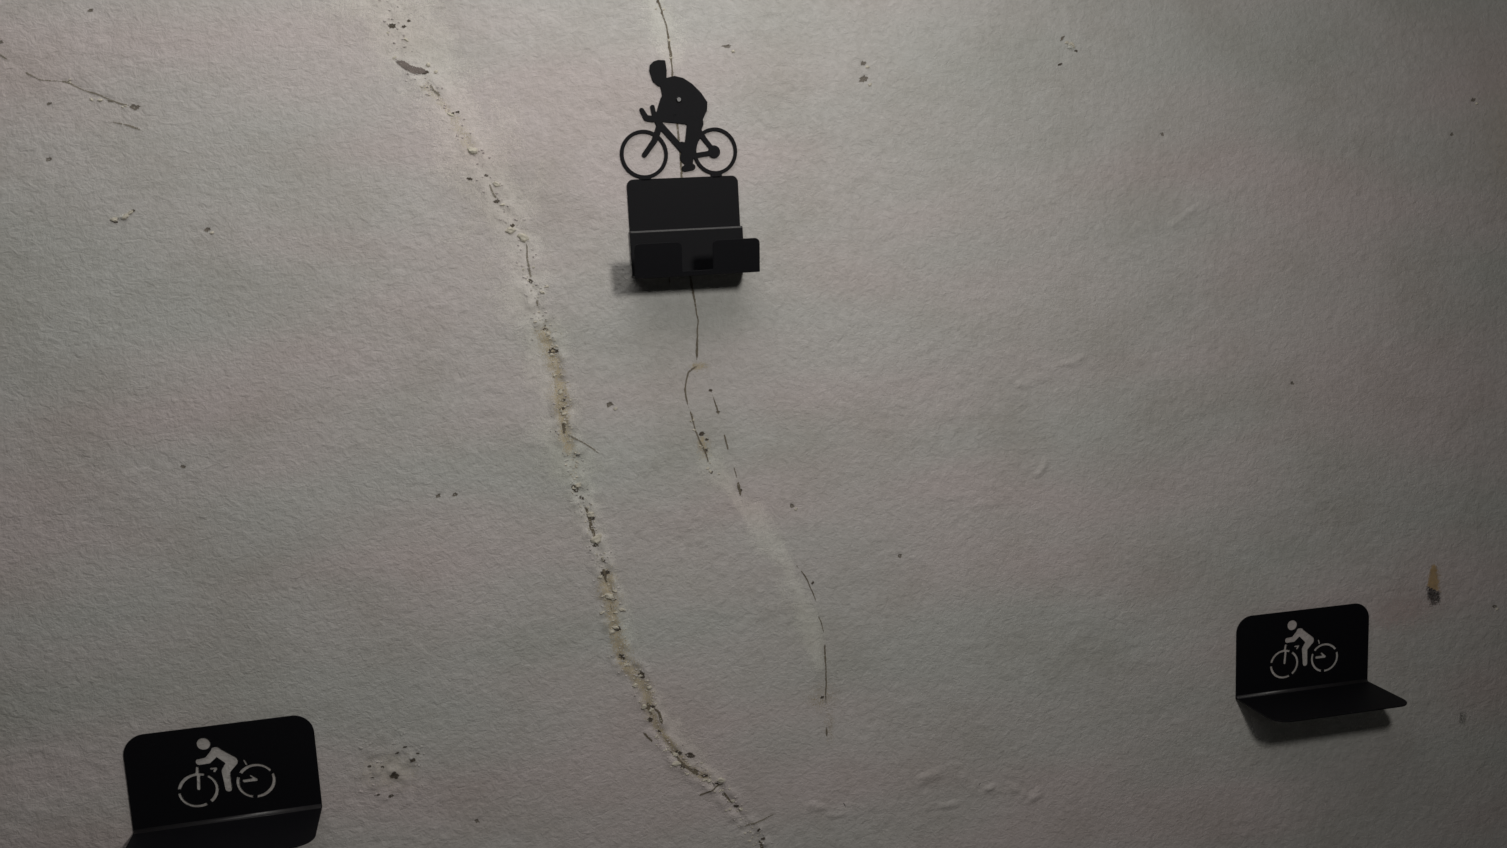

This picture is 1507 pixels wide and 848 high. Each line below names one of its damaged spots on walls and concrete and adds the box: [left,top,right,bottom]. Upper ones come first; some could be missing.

crack [272,0,773,848]
crack [669,276,829,736]